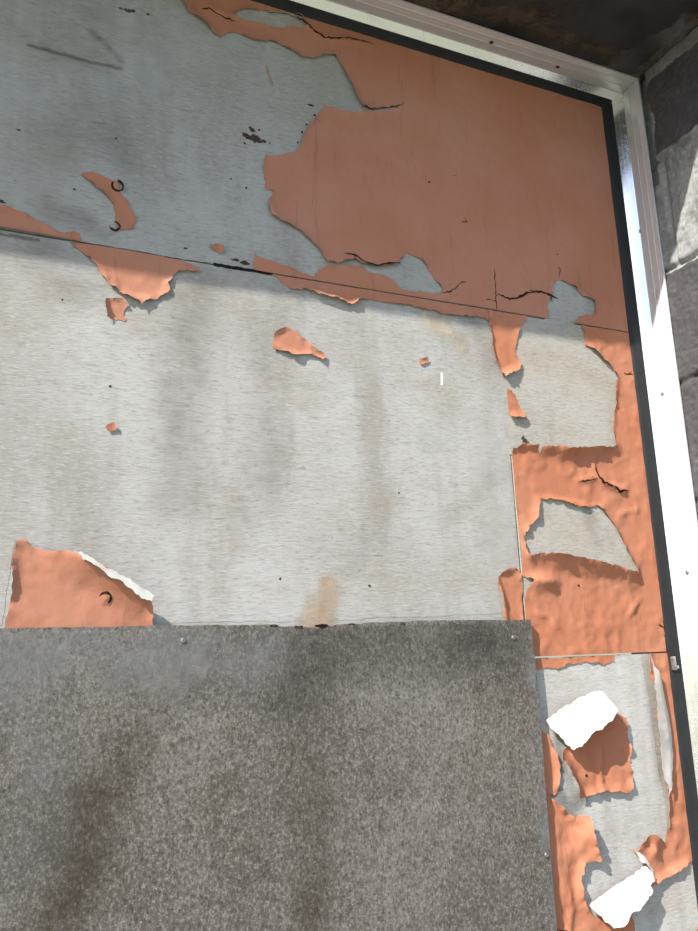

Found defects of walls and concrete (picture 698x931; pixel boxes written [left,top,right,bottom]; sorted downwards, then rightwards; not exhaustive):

crack [347,253,401,266]
crack [487,268,561,312]
peeling [0,0,633,629]
crack [578,464,629,493]
peeling [535,654,698,931]